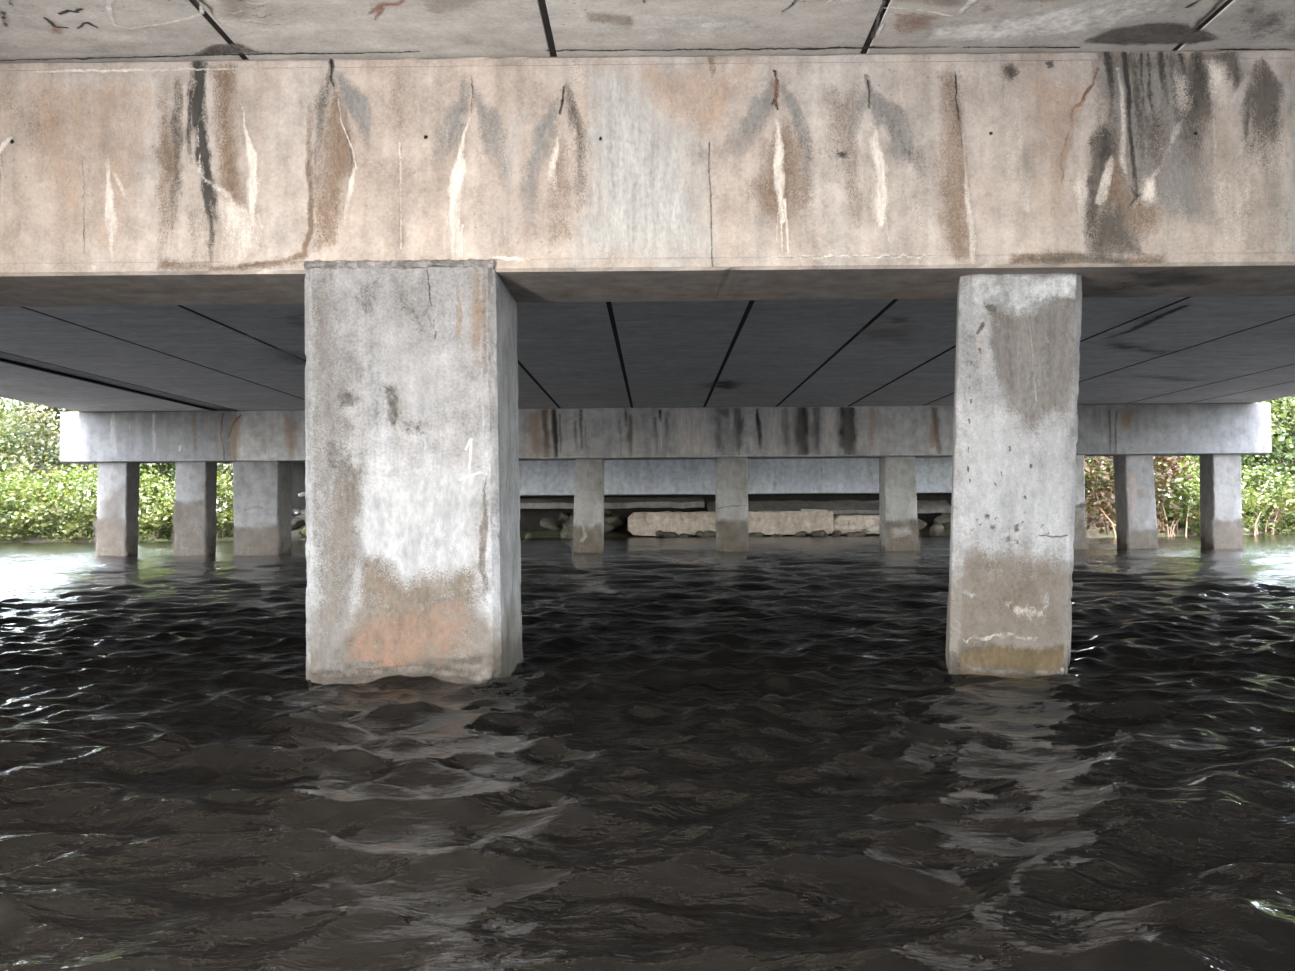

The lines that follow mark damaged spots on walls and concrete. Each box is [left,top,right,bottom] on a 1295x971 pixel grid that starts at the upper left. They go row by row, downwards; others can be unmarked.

water stain [0,0,419,272]
water stain [363,0,1295,504]
corrosion [343,547,487,678]